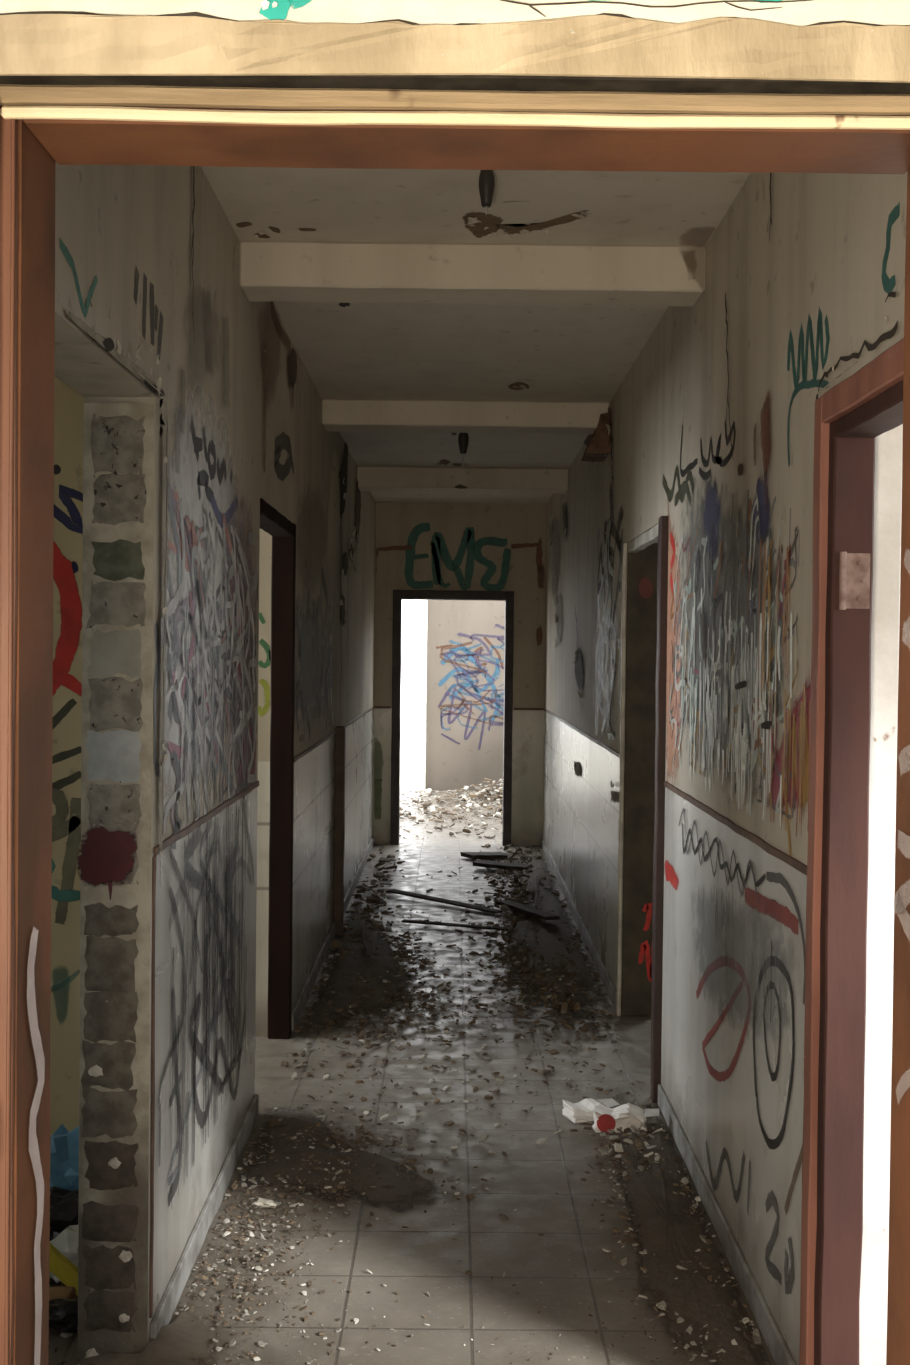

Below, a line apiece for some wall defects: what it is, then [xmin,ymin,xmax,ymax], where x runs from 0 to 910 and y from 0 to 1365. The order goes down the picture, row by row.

flaking render [69,311,169,1359]